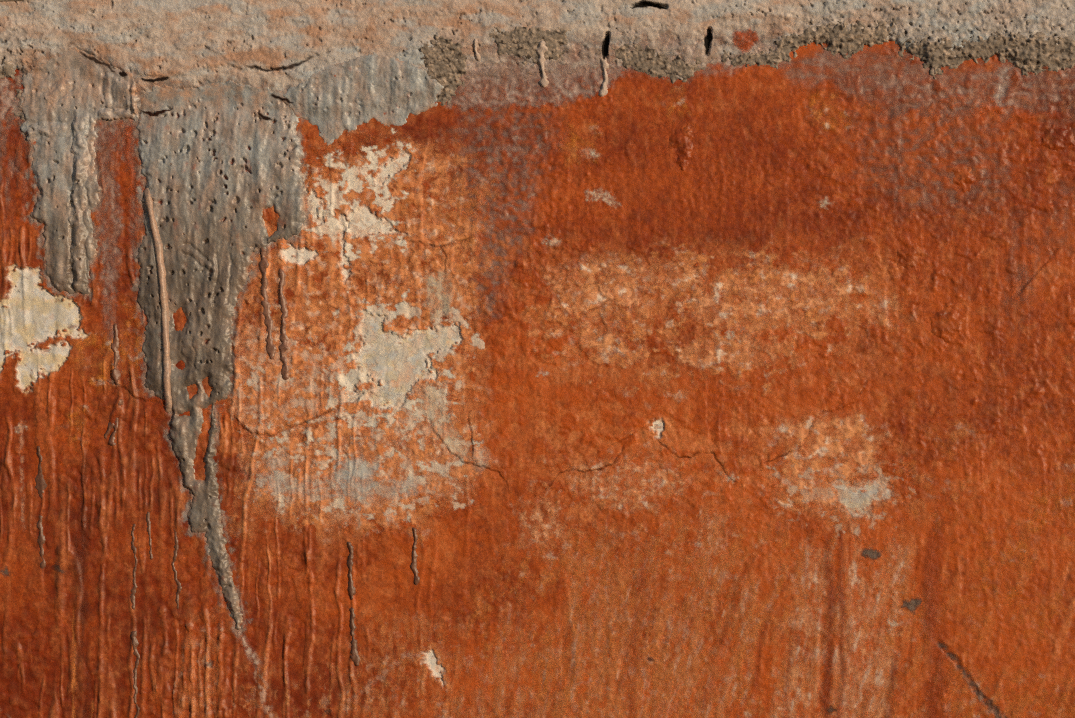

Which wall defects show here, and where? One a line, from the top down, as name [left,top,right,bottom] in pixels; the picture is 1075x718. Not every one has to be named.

peeling [0,264,141,393]
peeling [220,128,491,543]
peeling [390,643,461,717]